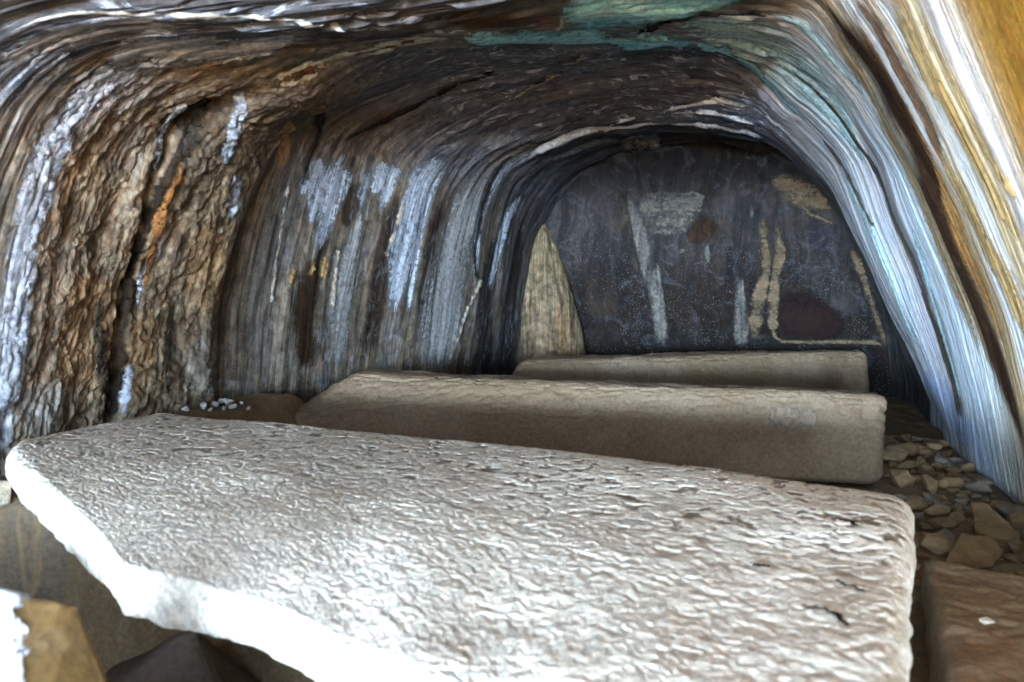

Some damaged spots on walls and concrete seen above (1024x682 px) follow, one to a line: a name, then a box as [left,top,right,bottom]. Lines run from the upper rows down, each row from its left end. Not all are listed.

damp [0,14,296,414]
corrosion [142,165,182,288]
damp [299,154,446,363]
damp [473,152,520,287]
damp [613,190,667,343]
damp [678,217,719,263]